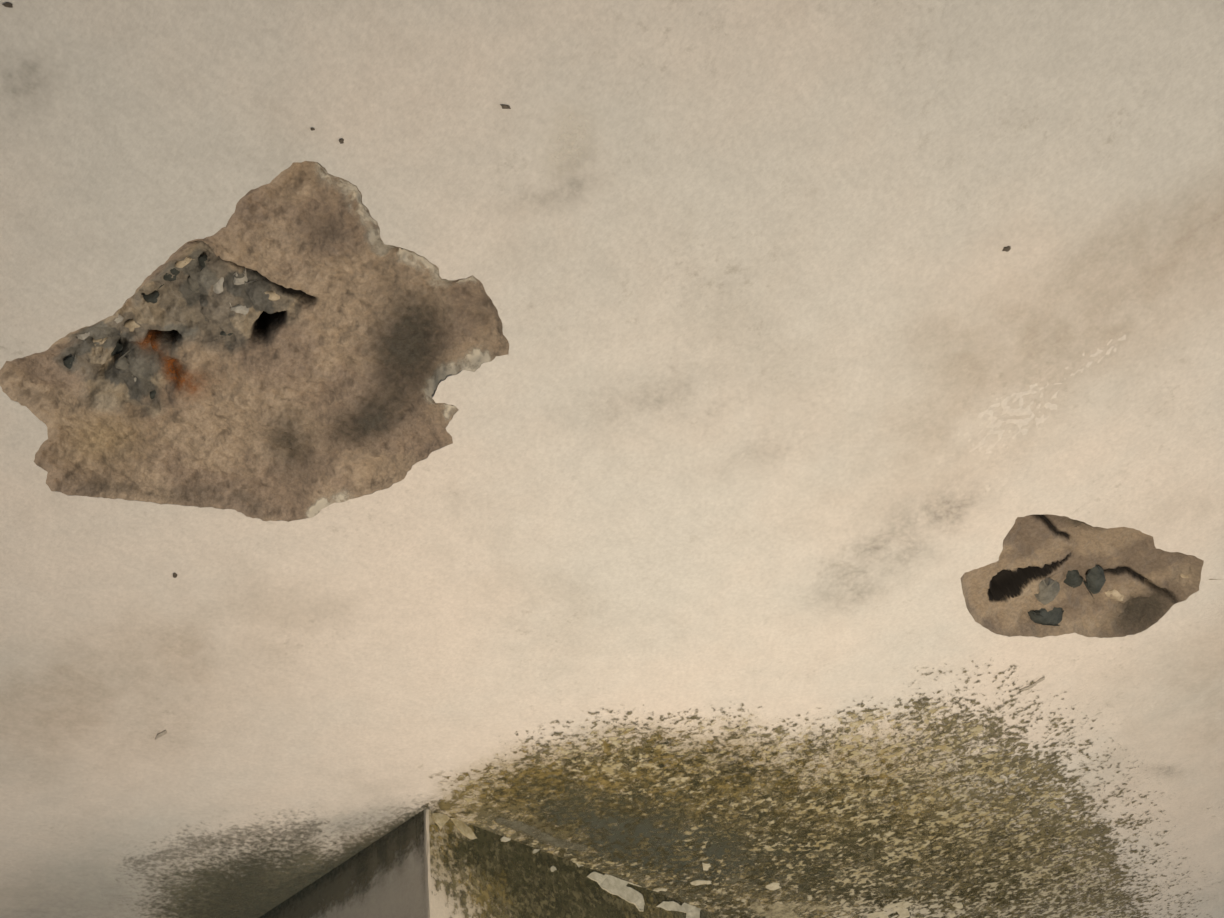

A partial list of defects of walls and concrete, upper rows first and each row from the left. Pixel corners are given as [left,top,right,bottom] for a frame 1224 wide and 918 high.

spalling [0,161,509,522]
spalling [960,514,1216,638]
leakage [152,661,1207,918]
peeling [576,863,701,918]
peeling [690,863,712,885]
peeling [867,901,914,918]